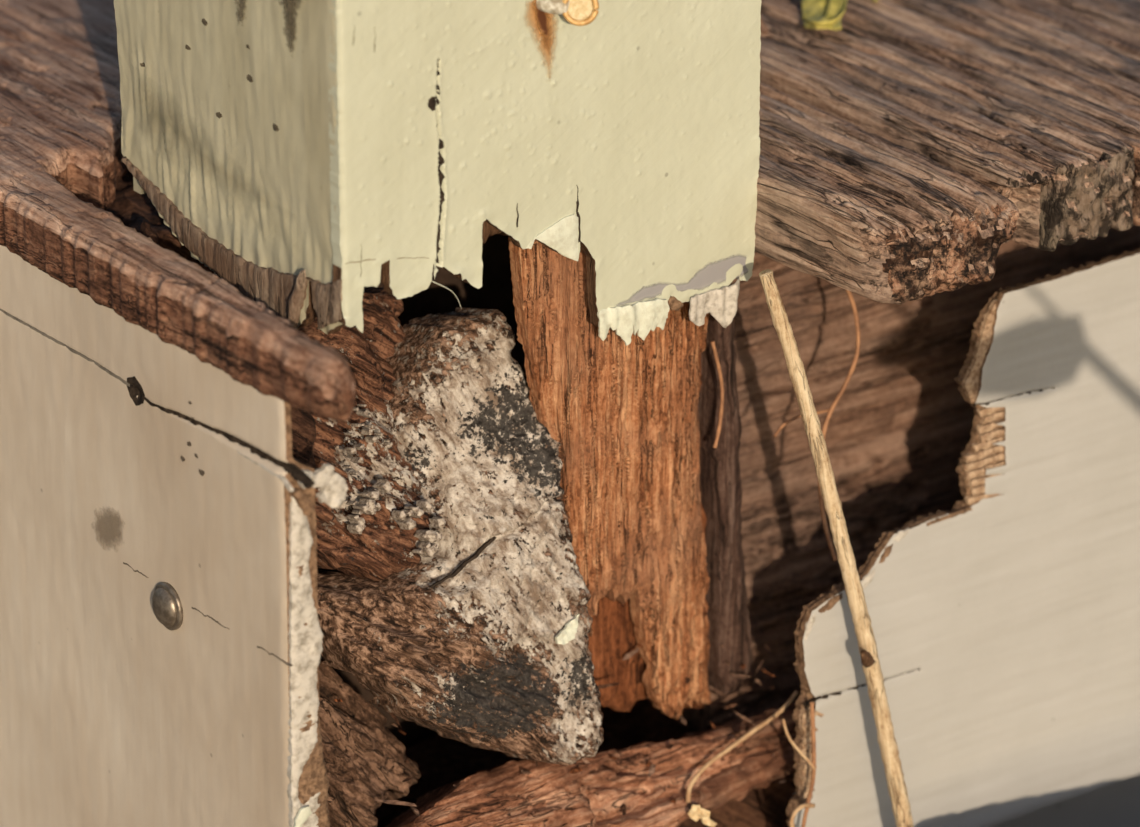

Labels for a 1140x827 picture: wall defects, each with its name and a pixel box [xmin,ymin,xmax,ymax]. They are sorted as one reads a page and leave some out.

corrosion [527,0,556,68]
crack [428,59,440,111]
crack [436,139,445,263]
peeling [526,214,579,261]
peeling [597,278,740,346]
crack [0,309,315,493]
spalling [926,298,1004,526]
crack [973,387,1055,406]
spalling [861,528,910,590]
spalling [804,593,843,640]
crack [803,669,920,708]